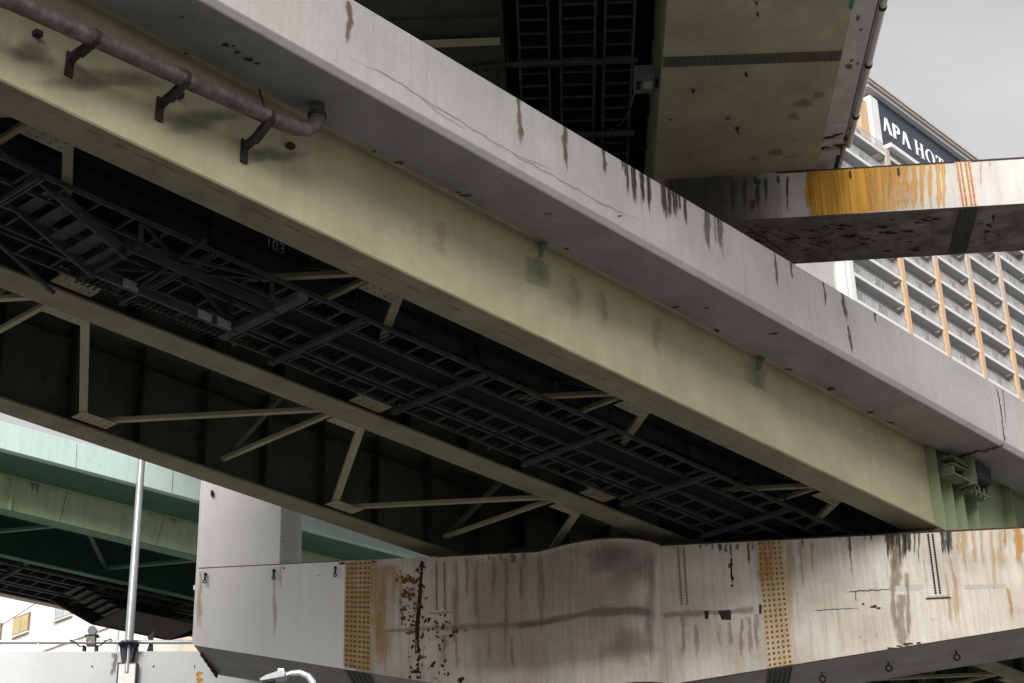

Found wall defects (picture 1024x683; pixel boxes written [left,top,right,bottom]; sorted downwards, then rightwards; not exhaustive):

leakage [622,161,789,249]
rust [723,157,1024,222]
crack [960,390,1006,457]
rust [436,526,1024,580]
leakage [939,532,952,554]
leakage [885,533,920,644]